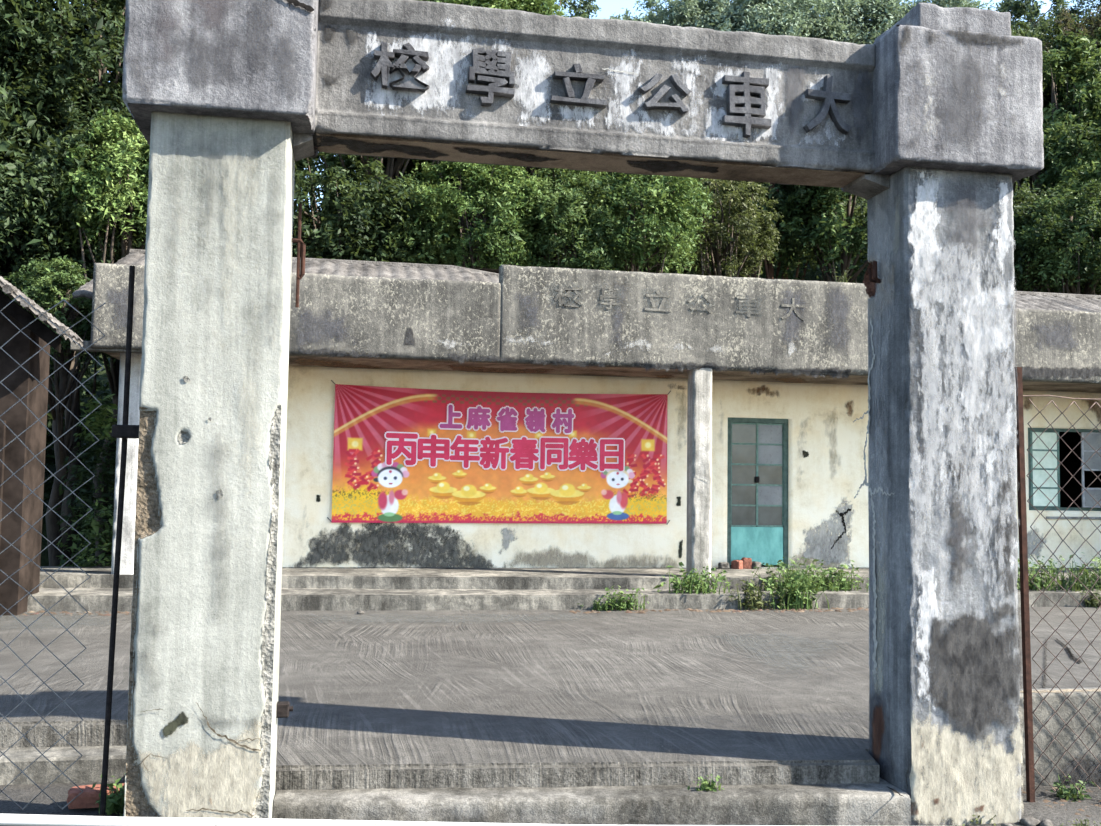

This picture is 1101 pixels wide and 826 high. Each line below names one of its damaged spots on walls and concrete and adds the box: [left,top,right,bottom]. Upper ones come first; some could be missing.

crack [286,0,314,12]
peeling [365,19,782,142]
peeling [801,70,824,103]
peeling [799,122,846,146]
mould [296,523,493,568]
crack [831,318,894,674]
peeling [862,172,1023,826]
water stain [948,452,974,584]
water stain [1027,529,1046,558]
peeling [125,405,281,818]
water stain [929,479,1022,739]
crack [197,703,261,751]